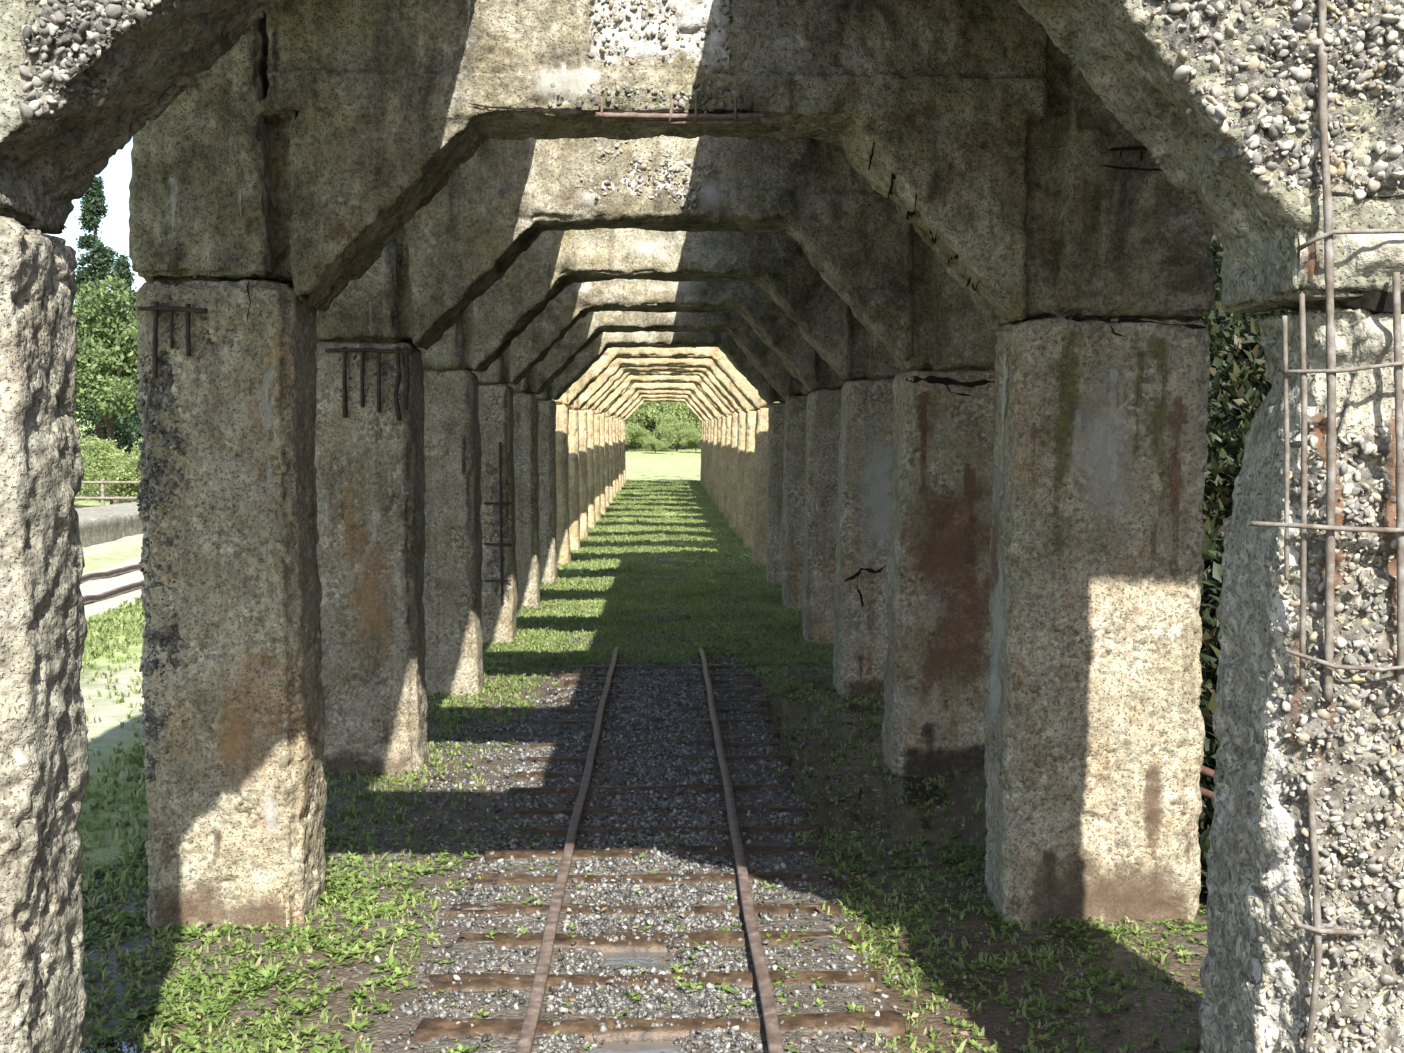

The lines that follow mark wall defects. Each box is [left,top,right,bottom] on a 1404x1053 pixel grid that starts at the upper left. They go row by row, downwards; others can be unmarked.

spalling [548,0,767,125]
crack [868,142,979,291]
crack [906,375,995,396]
leakage [1073,339,1169,497]
crack [844,566,886,607]
spalling [1142,0,1404,1053]